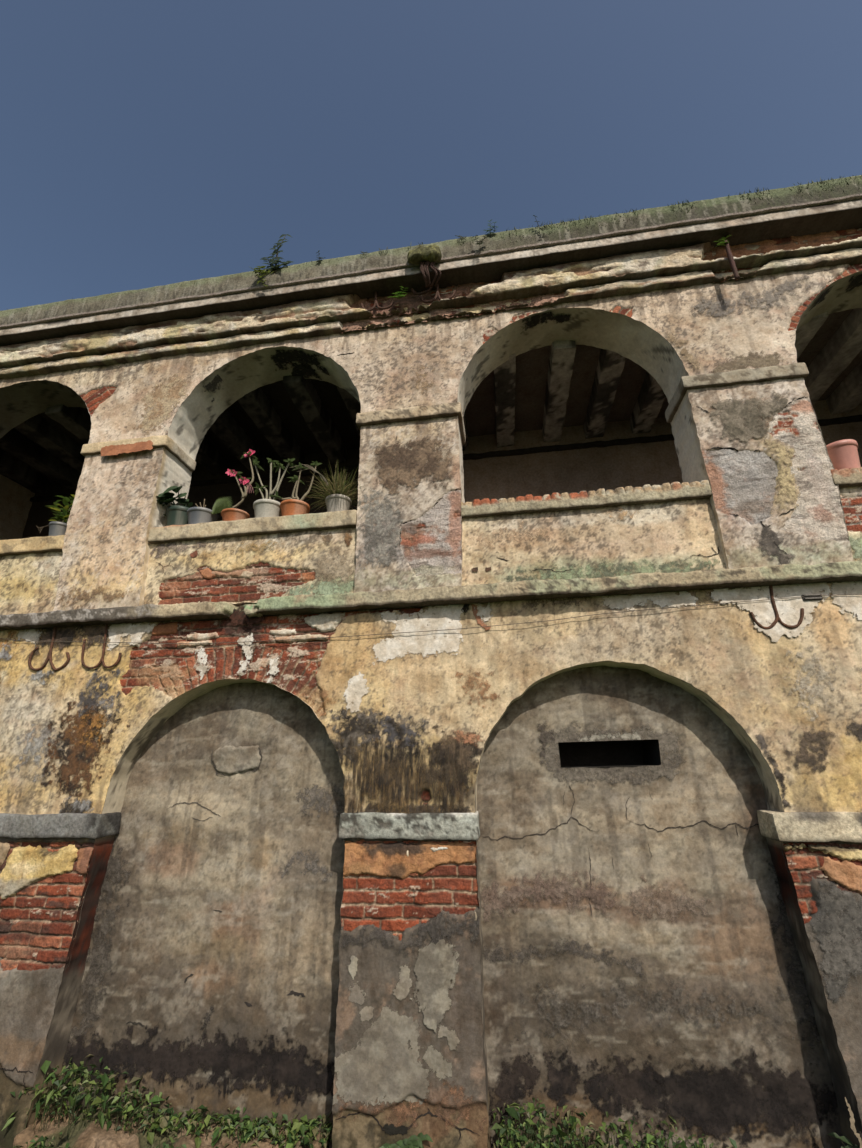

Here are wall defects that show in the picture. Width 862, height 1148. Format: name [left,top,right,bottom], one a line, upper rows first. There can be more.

peeling [702,398,862,542]
leakage [76,668,122,724]
peeling [158,550,316,605]
peeling [107,603,493,718]
peeling [599,581,862,642]
leakage [296,704,484,818]
crack [626,791,759,856]
peeling [0,841,94,971]
peeling [340,839,479,941]
peeling [781,842,862,924]
peeling [332,939,460,1108]
crack [335,1107,477,1140]